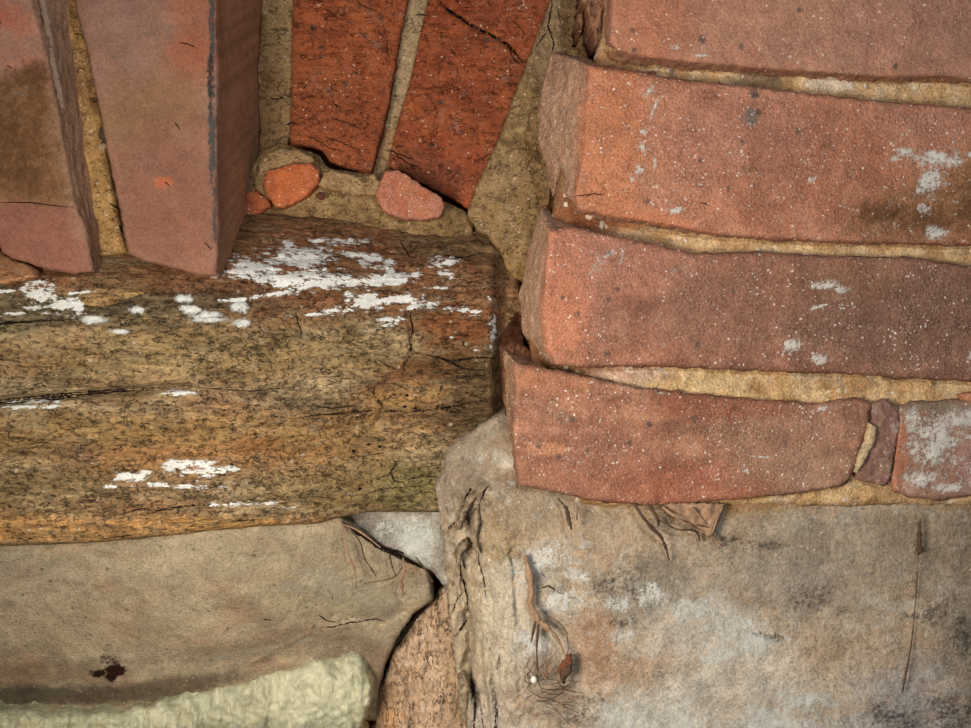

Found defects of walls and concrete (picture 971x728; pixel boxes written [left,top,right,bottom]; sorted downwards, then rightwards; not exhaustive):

damp [39,0,63,108]
damp [891,147,971,240]
damp [0,279,129,334]
damp [175,237,497,351]
crack [0,311,493,419]
damp [105,458,240,490]
damp [209,501,296,509]
damp [900,407,971,494]